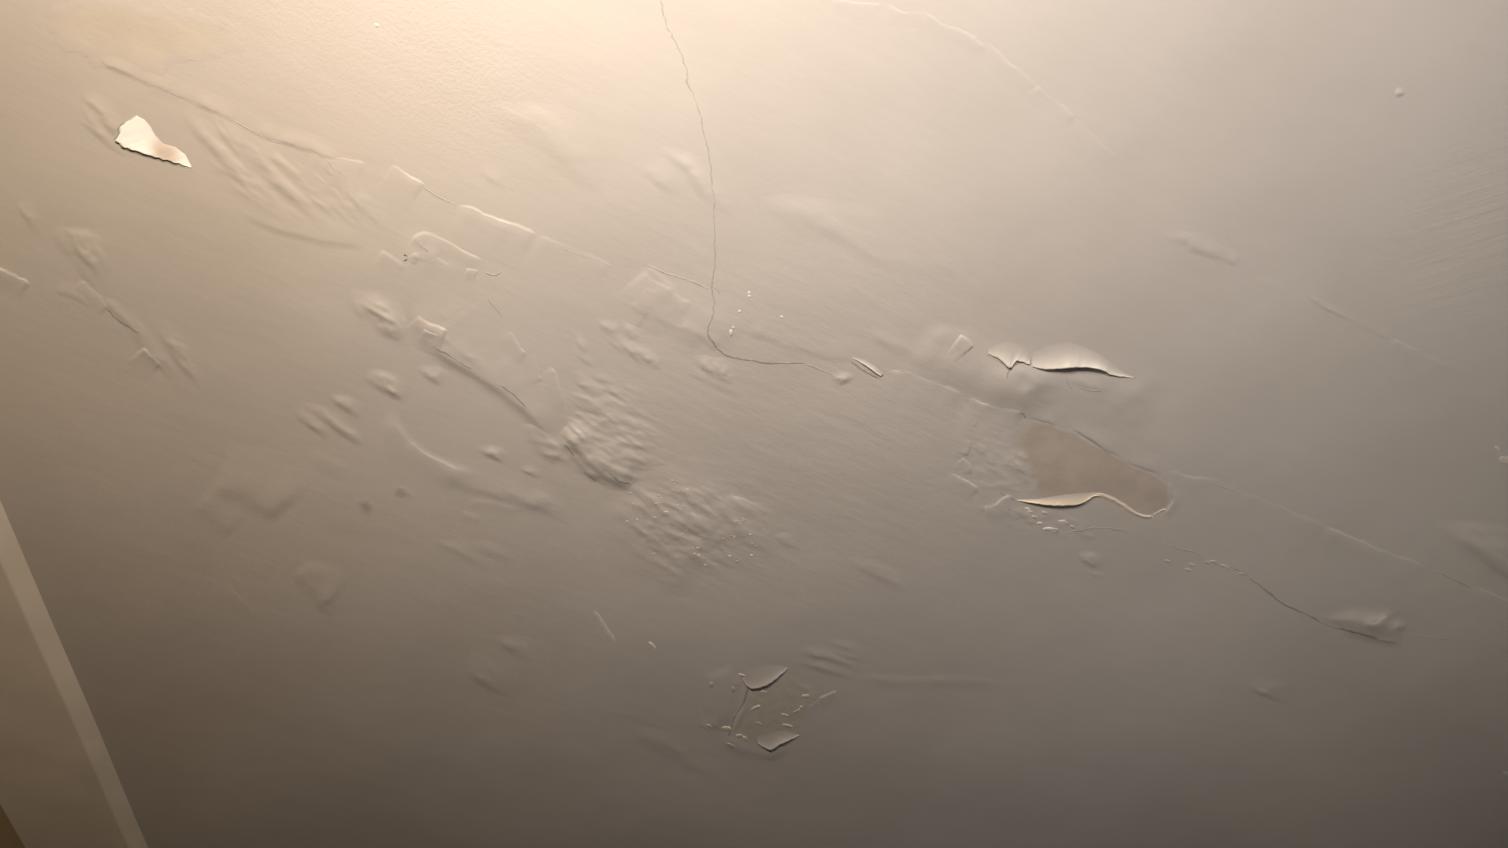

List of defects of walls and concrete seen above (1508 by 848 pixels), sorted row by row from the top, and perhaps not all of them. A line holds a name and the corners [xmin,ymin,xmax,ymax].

peeling [113,115,192,169]
crack [660,0,840,380]
peeling [946,334,1136,392]
flaking render [984,402,1183,526]
crack [1045,527,1358,633]